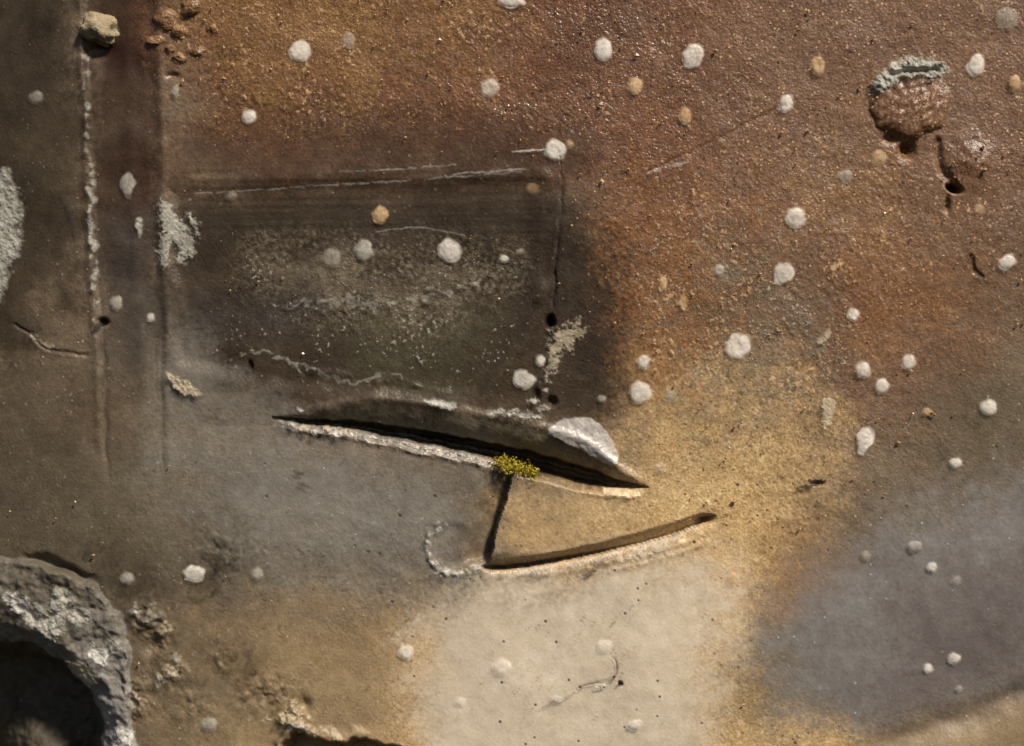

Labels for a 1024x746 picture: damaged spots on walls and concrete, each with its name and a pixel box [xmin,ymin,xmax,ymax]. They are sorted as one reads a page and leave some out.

leakage [191,232,500,408]
corrosion [184,0,1024,694]
spalling [0,555,146,746]